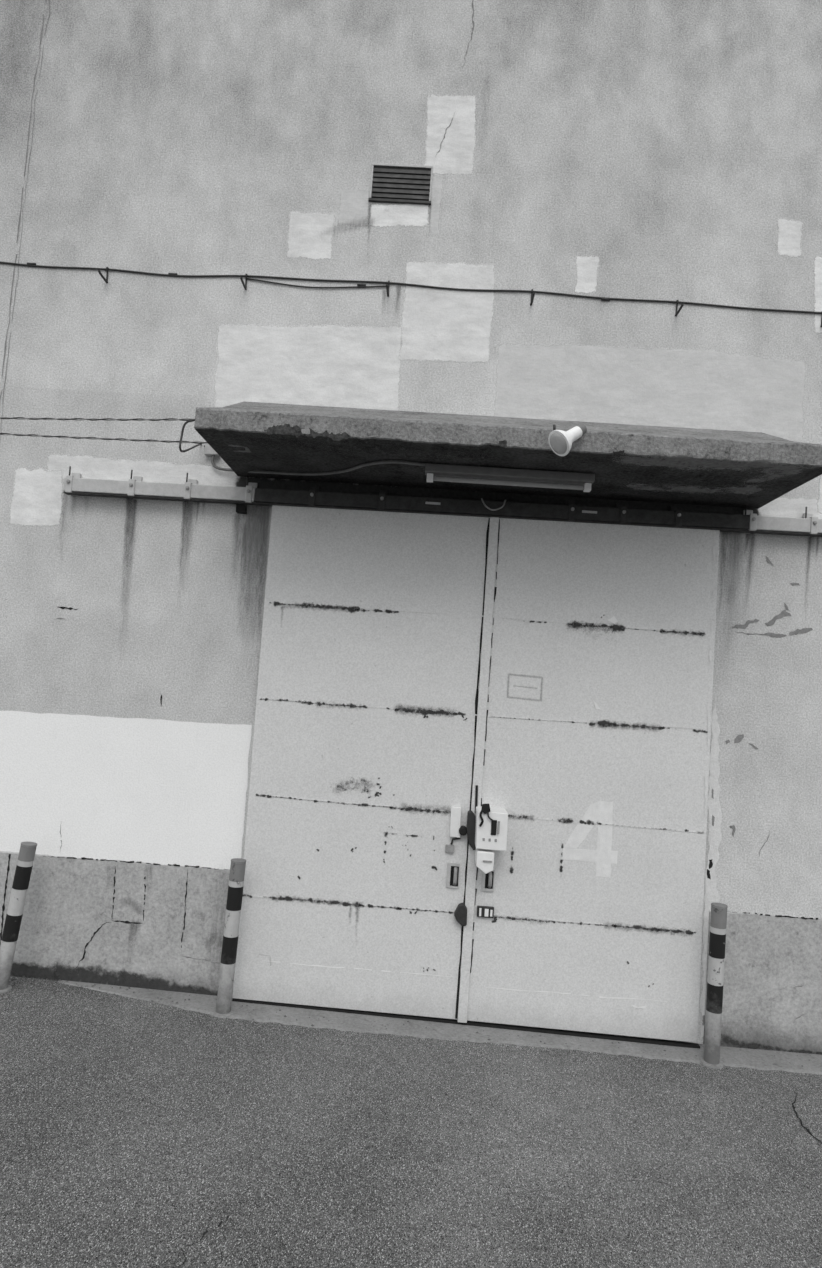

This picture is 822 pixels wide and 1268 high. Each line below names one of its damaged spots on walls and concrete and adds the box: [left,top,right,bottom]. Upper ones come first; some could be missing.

crack [463,0,474,66]
rust [270,601,399,613]
rust [568,615,704,635]
rust [260,698,367,708]
rust [387,706,467,721]
rust [589,720,670,730]
rust [256,778,451,813]
crack [48,825,228,968]
rust [270,896,453,914]
rust [492,917,696,935]
crack [792,1088,822,1143]
crack [175,1211,240,1268]